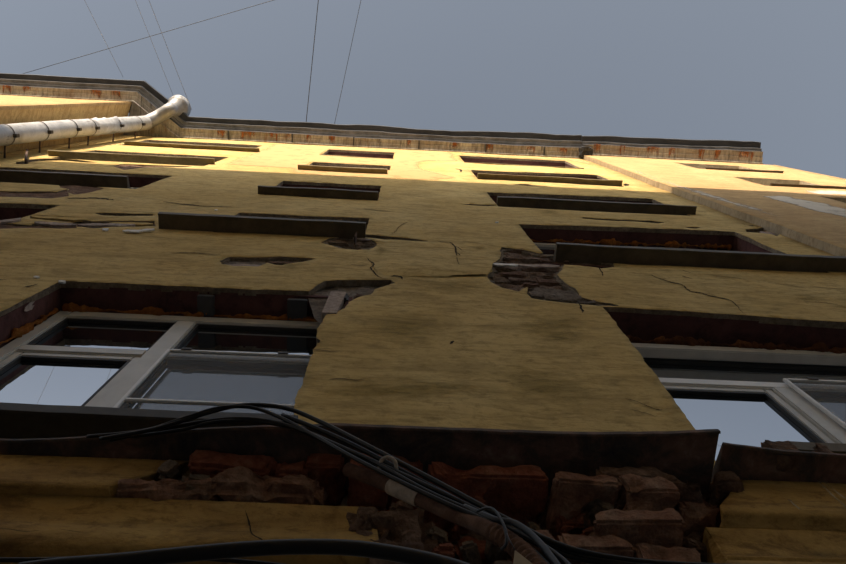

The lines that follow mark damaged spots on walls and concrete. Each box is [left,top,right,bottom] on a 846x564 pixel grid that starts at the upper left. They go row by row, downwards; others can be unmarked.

spalling [488,249,554,284]
crack [652,275,741,311]
flaking render [115,450,745,564]